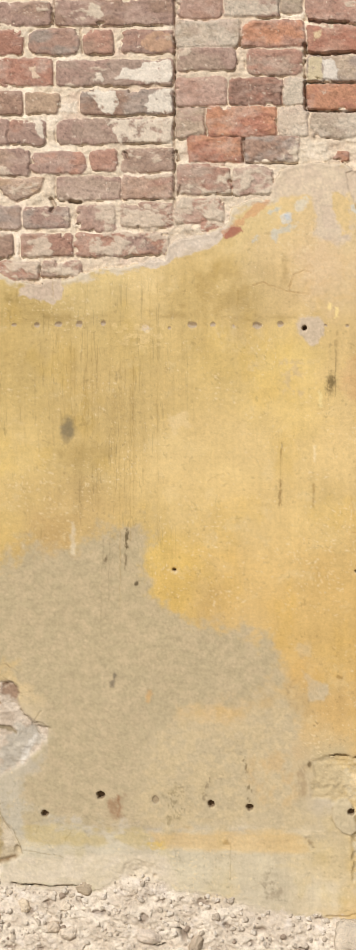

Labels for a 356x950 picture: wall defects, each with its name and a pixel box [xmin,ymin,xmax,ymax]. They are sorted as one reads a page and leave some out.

peeling [18,277,66,307]
damp [0,243,302,638]
peeling [135,158,356,270]
peeling [0,507,356,950]